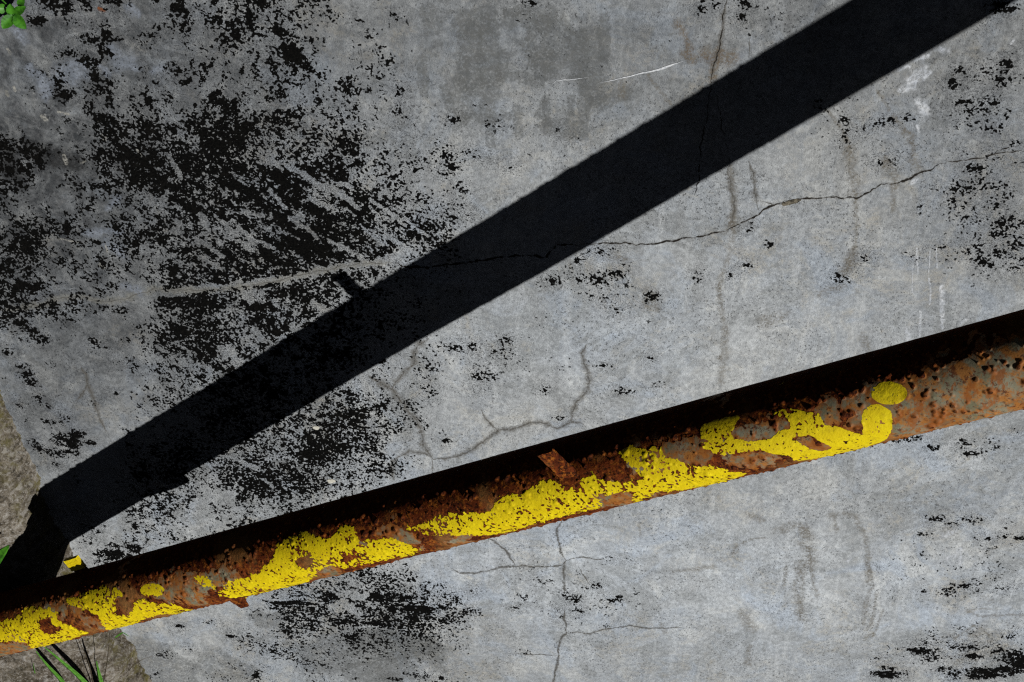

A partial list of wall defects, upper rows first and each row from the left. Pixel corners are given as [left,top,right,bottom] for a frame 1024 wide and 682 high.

leakage [27,61,86,99]
crack [695,2,728,193]
crack [368,146,1017,269]
crack [375,338,589,474]
corrosion [230,598,249,608]